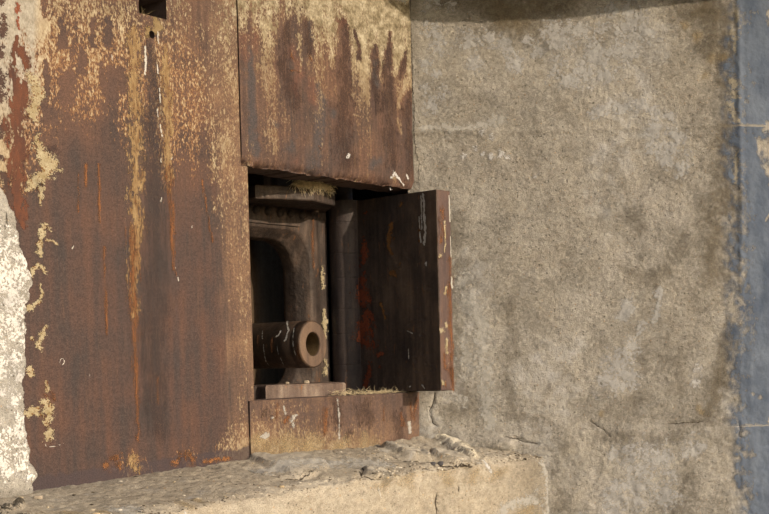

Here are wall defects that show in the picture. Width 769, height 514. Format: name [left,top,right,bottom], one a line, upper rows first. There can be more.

rust [0,0,32,230]
damp [0,215,37,484]
rust [123,17,164,441]
rust [159,45,177,275]
crack [395,458,473,468]
rust [444,256,454,392]
damp [418,0,693,179]
peeling [721,0,769,514]